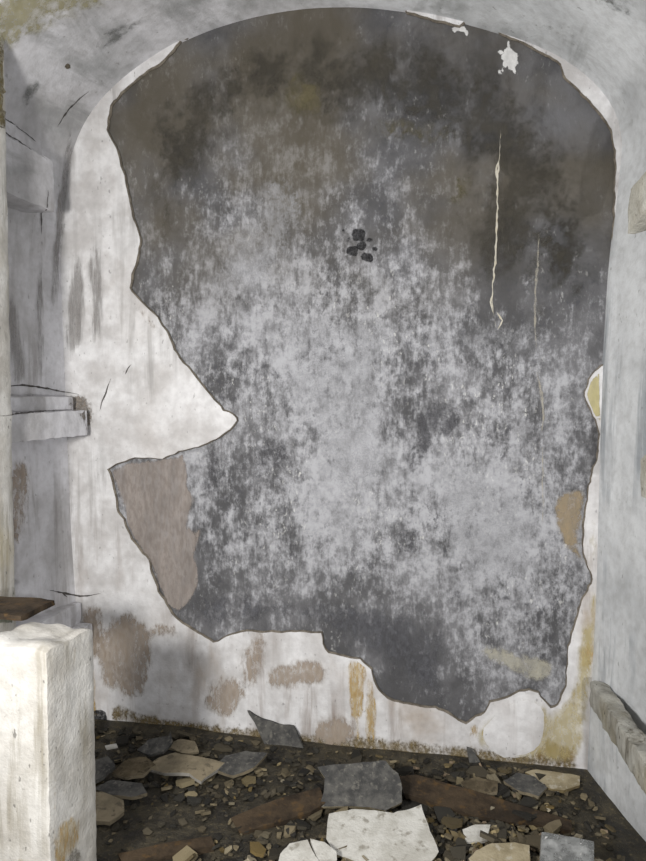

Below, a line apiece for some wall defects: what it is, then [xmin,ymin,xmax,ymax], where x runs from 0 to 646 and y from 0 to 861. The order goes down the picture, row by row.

leakage [0,0,98,44]
crack [0,119,45,158]
leakage [300,47,568,271]
leakage [55,146,71,268]
crack [490,136,503,329]
leakage [67,253,101,346]
spalling [106,7,617,724]
leakage [94,710,107,720]
leakage [83,608,174,696]
leakage [205,639,264,716]
leakage [269,662,324,686]
leakage [315,717,354,745]